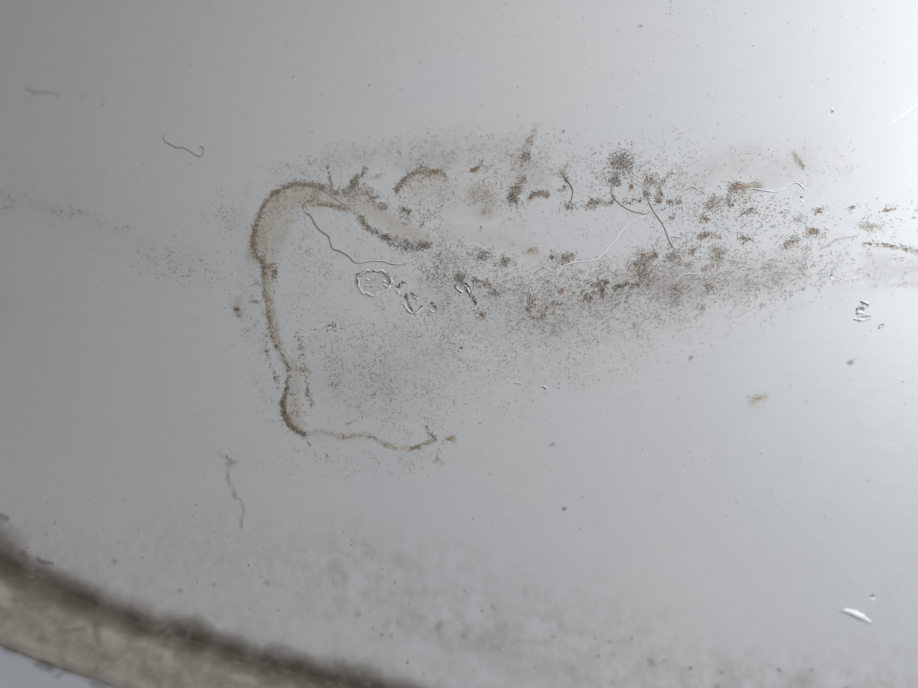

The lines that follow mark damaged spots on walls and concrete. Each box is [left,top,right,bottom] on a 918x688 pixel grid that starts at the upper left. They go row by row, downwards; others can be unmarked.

leakage [0,15,918,492]
leakage [0,555,385,688]